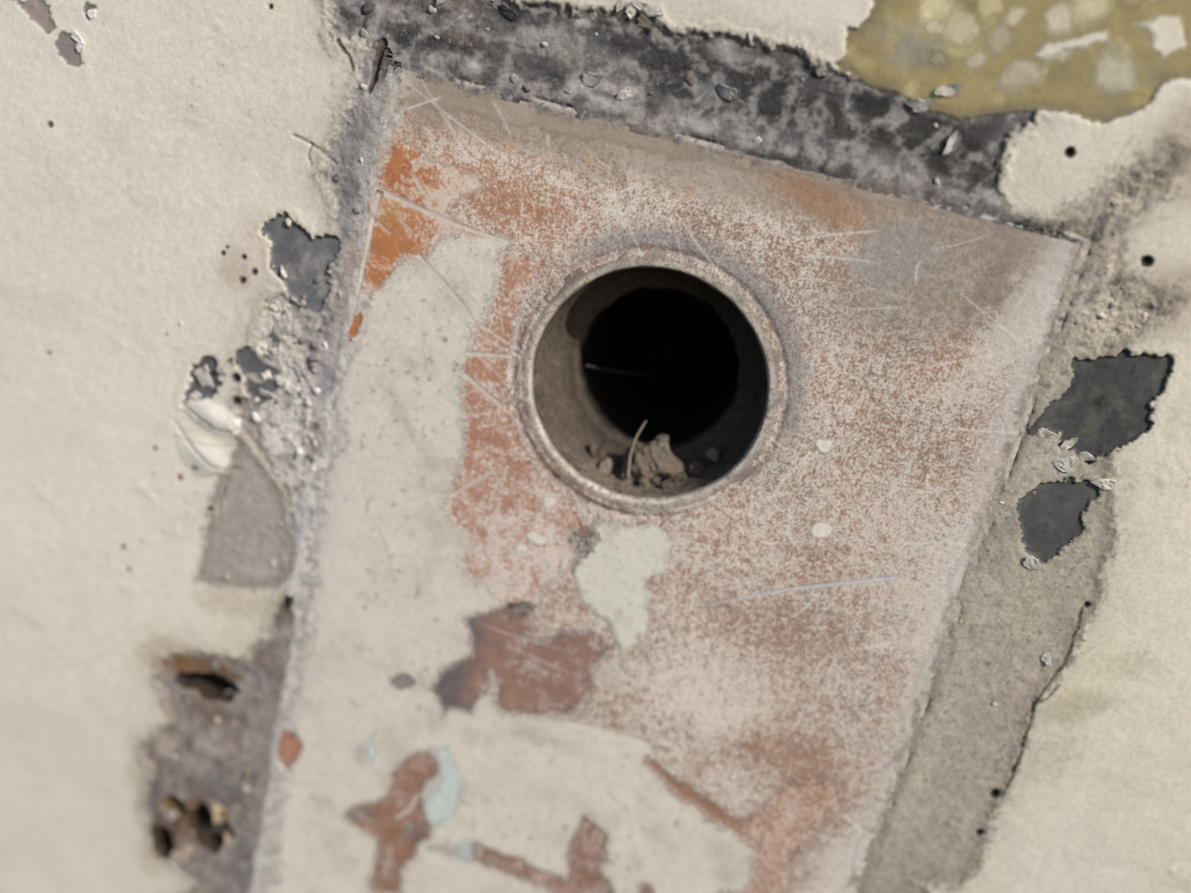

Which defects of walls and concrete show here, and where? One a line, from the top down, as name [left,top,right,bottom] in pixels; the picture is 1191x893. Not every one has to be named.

peeling [12,0,86,67]
spalling [141,48,396,893]
spalling [328,0,1191,893]
crack [1003,610,1082,792]